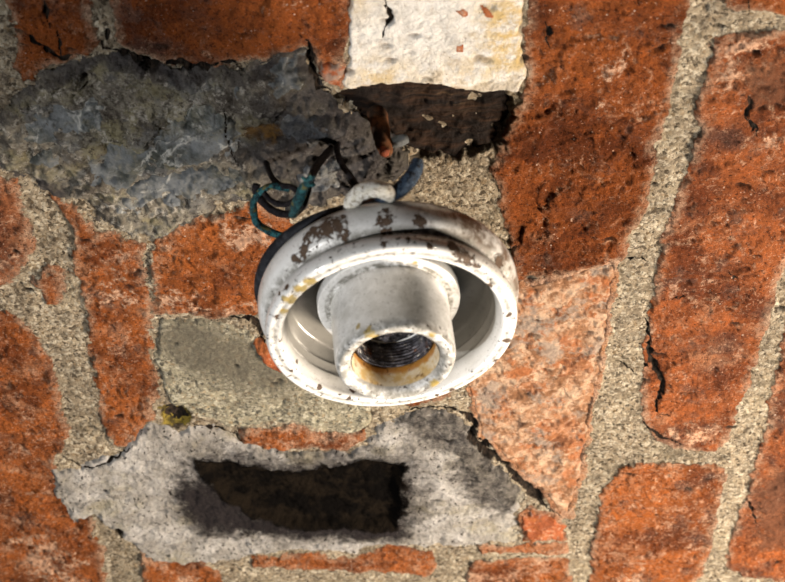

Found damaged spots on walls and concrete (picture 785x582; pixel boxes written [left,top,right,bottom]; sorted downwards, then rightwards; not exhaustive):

crack [25,0,80,61]
crack [97,28,242,76]
spalling [0,47,410,239]
crack [214,315,265,343]
crack [620,317,681,445]
spalling [165,403,190,419]
crack [400,405,561,516]
peeling [52,468,93,523]
peeling [246,534,366,554]